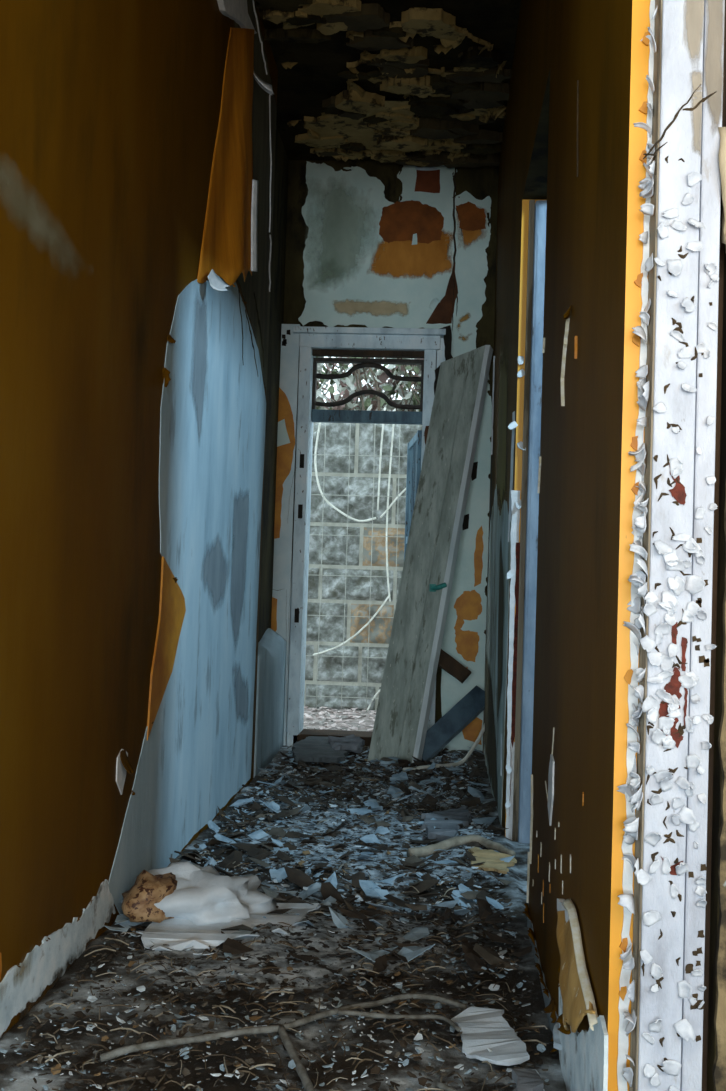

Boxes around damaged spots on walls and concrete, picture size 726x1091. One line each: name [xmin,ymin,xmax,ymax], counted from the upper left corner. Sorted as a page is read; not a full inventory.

peeling [685,0,724,155]
peeling [654,171,705,276]
peeling [704,263,719,288]
peeling [670,330,711,369]
peeling [0,0,512,1037]
flaking render [441,375,526,840]
peeling [640,503,718,849]
spalling [523,728,608,1091]
peeling [643,910,662,927]
peeling [636,857,707,908]
peeling [640,930,706,1045]
peeling [643,1060,682,1091]